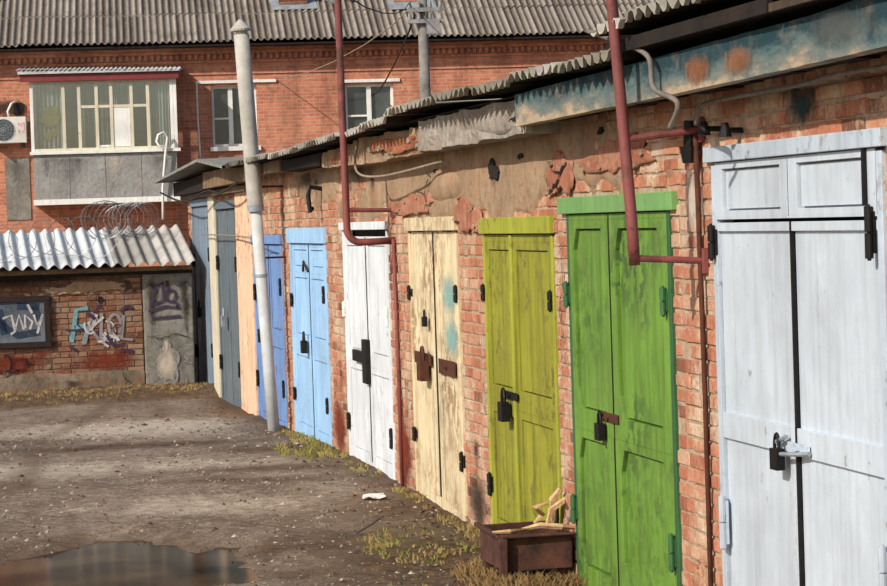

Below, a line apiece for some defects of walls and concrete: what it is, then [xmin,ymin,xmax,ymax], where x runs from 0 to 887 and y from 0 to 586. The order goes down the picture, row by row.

spalling [367,136,418,155]
hole [488,158,500,181]
peeling [543,127,621,196]
peeling [387,192,434,216]
peeling [452,195,483,233]